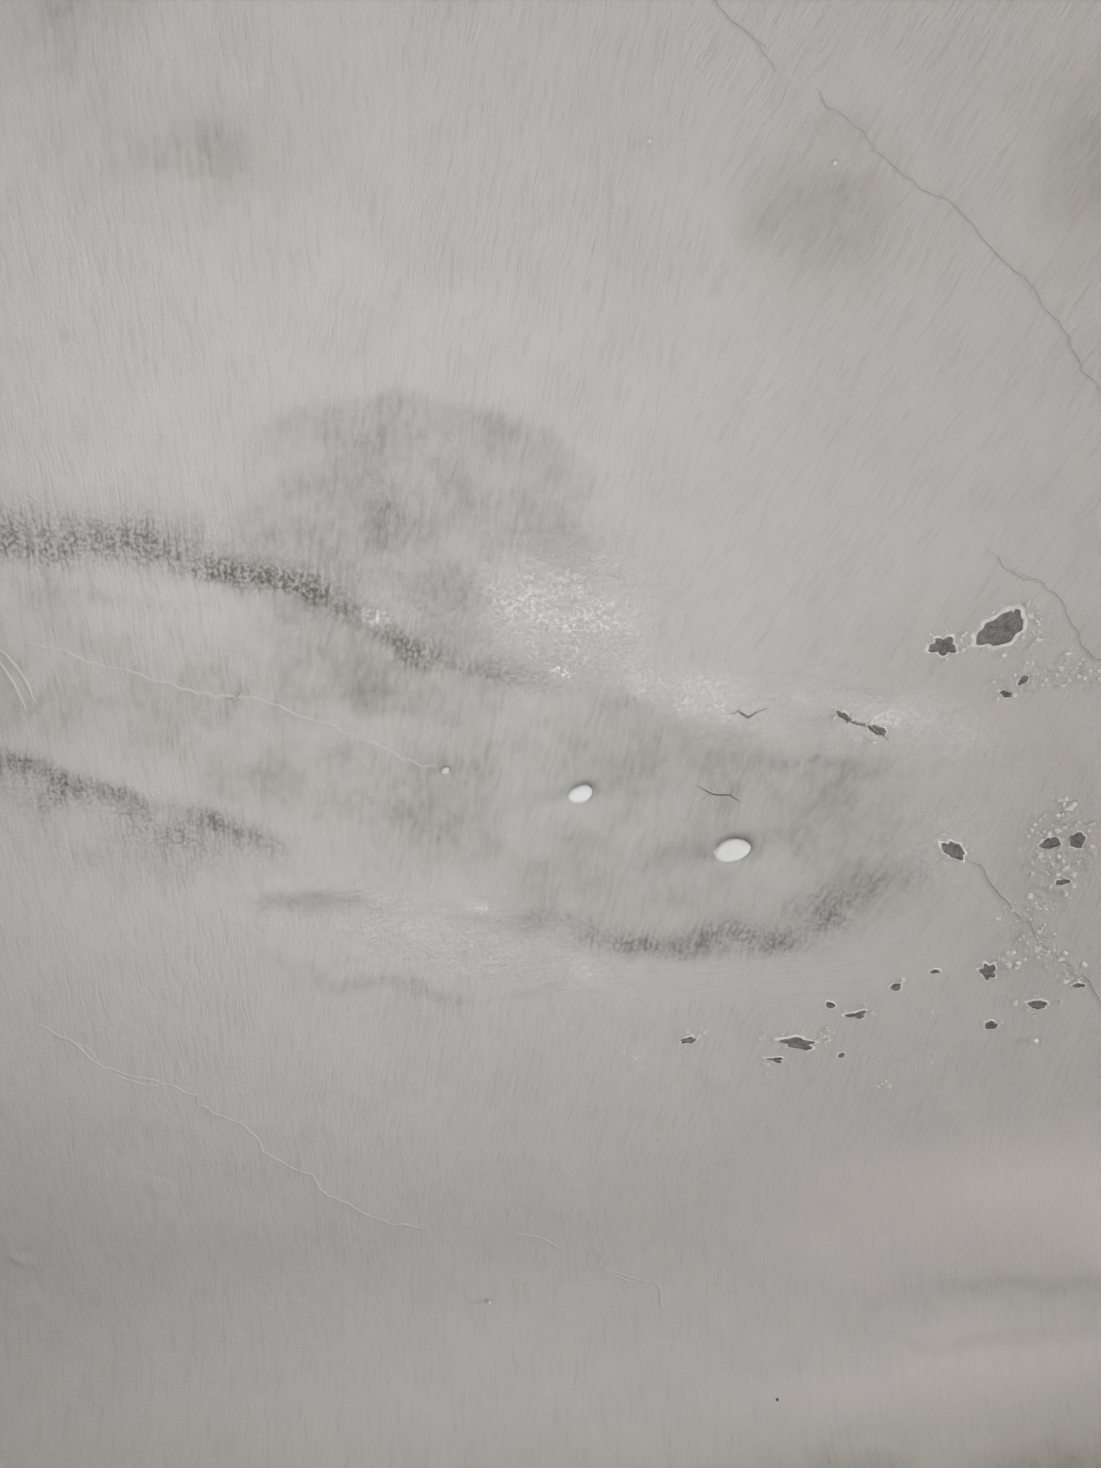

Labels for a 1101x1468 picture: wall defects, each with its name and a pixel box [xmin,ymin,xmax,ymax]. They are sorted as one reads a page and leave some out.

crack [714,0,777,73]
crack [816,88,1100,392]
damp [101,529,243,582]
damp [490,557,634,681]
spalling [924,599,1039,664]
crack [0,639,439,770]
spalling [996,674,1034,700]
spalling [937,832,973,864]
flaking render [976,797,1099,1017]
spalling [824,1000,877,1020]
spalling [762,1030,820,1067]
crack [36,1024,434,1230]